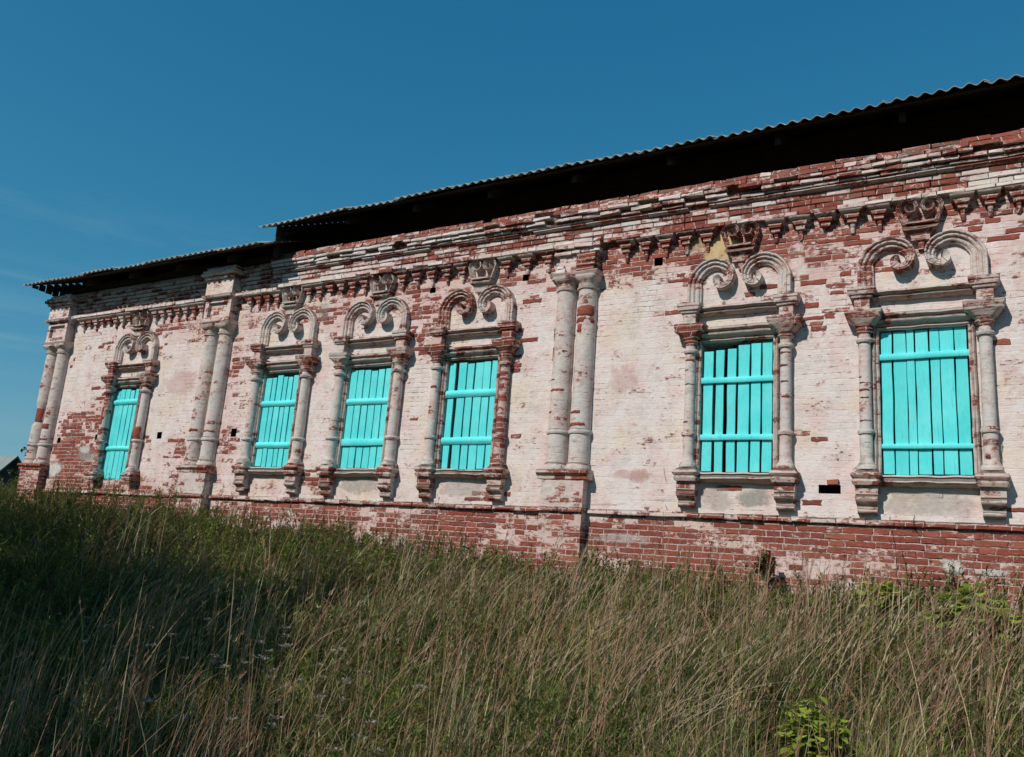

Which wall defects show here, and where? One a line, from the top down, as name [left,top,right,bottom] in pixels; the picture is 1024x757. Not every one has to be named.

peeling [744,218,901,255]
peeling [937,204,1024,243]
peeling [654,249,723,283]
peeling [522,294,542,304]
peeling [744,284,777,297]
peeling [800,279,844,295]
spalling [576,305,595,333]
peeling [803,302,850,332]
peeling [35,386,106,476]
spalling [802,479,841,506]
peeling [437,491,538,530]
peeling [797,526,1024,563]